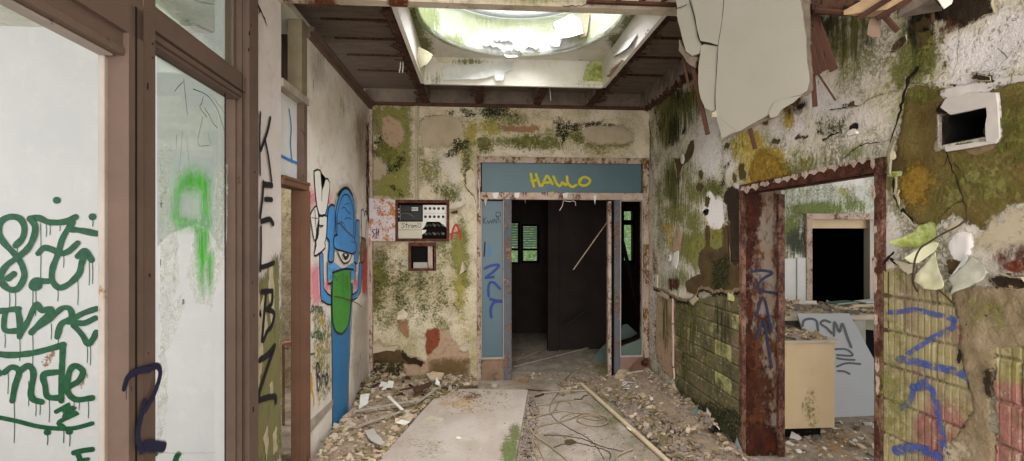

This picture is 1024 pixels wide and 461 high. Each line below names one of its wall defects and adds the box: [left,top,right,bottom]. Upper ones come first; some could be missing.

peeling [417,13,590,81]
peeling [578,34,637,85]
spalling [724,0,813,150]
water stain [444,138,470,157]
water stain [449,108,519,120]
water stain [552,117,614,143]
water stain [924,105,941,165]
crack [892,152,967,226]
flaking render [883,75,1024,461]
spalling [373,309,470,381]
flaking render [653,286,740,442]
corrosion [743,191,777,456]